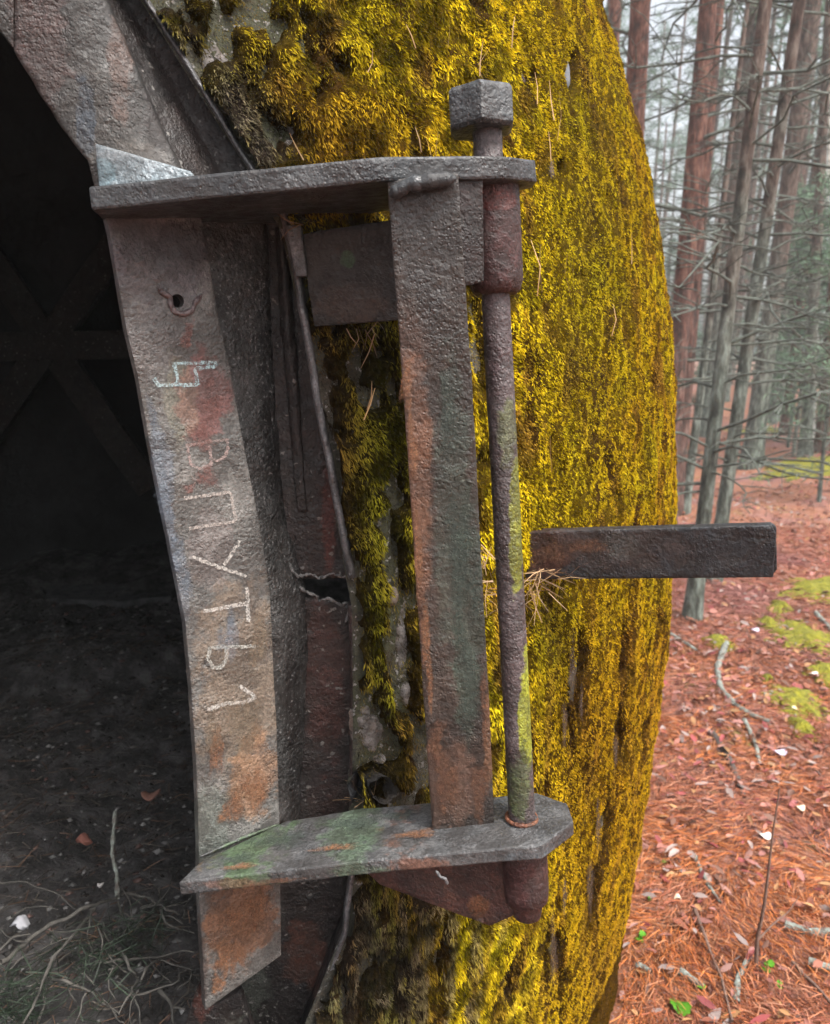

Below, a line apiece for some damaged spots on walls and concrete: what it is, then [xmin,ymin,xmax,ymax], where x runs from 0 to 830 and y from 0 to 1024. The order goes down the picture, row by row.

corrosion [401,359,418,476]
crack [289,563,349,622]
corrosion [413,510,460,813]